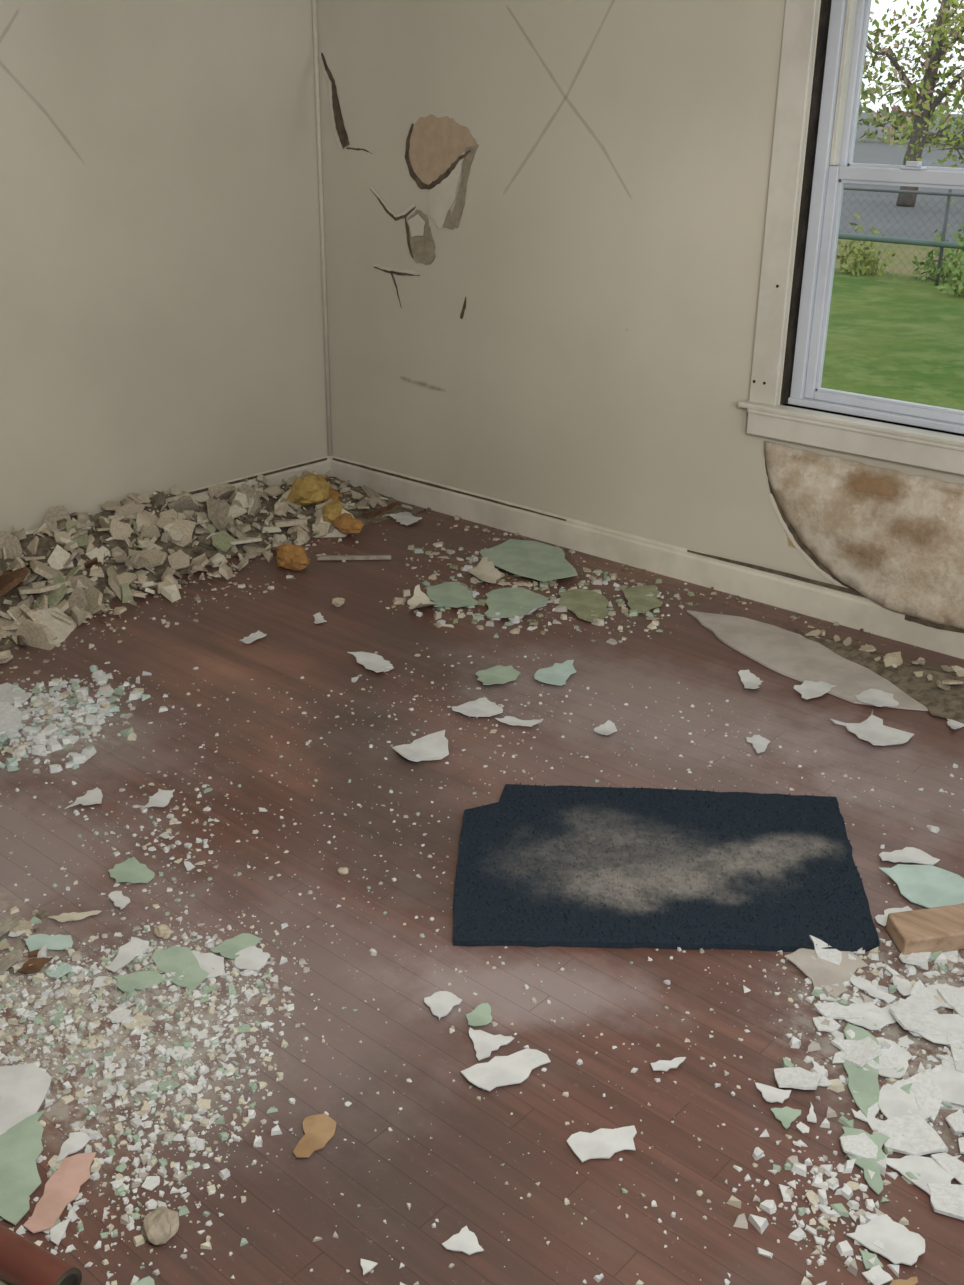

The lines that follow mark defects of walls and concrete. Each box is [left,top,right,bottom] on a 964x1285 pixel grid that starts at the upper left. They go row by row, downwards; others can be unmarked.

crack [318,53,373,154]
crack [370,186,416,221]
spalling [404,114,479,265]
crack [373,263,420,306]
water stain [850,473,899,500]